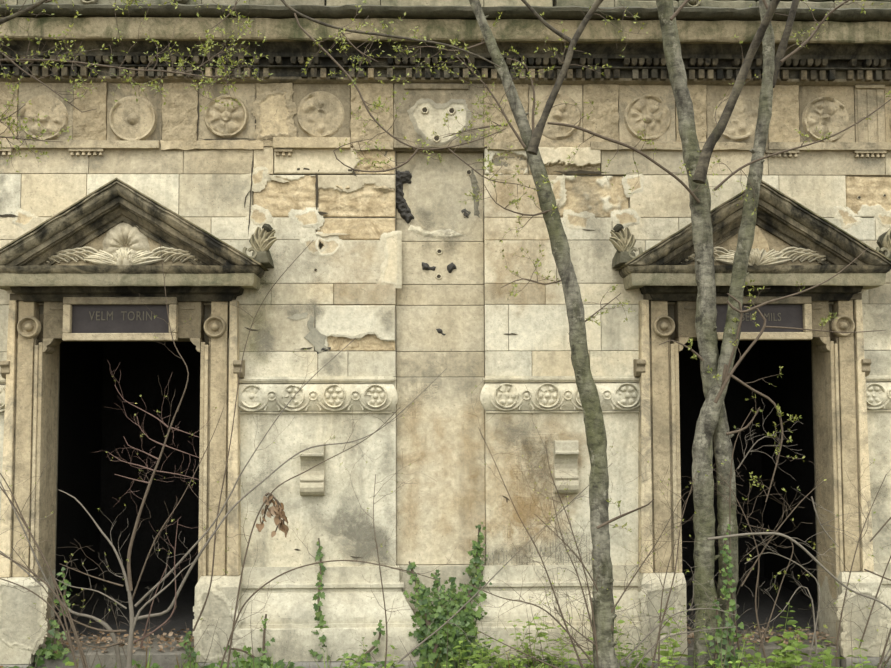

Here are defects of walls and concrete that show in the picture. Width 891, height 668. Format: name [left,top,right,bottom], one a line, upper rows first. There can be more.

spalling [251,87,297,142]
spalling [407,98,472,146]
spalling [484,148,532,175]
spalling [246,147,402,288]
spalling [539,147,645,231]
spalling [833,176,891,229]
spalling [287,305,395,354]